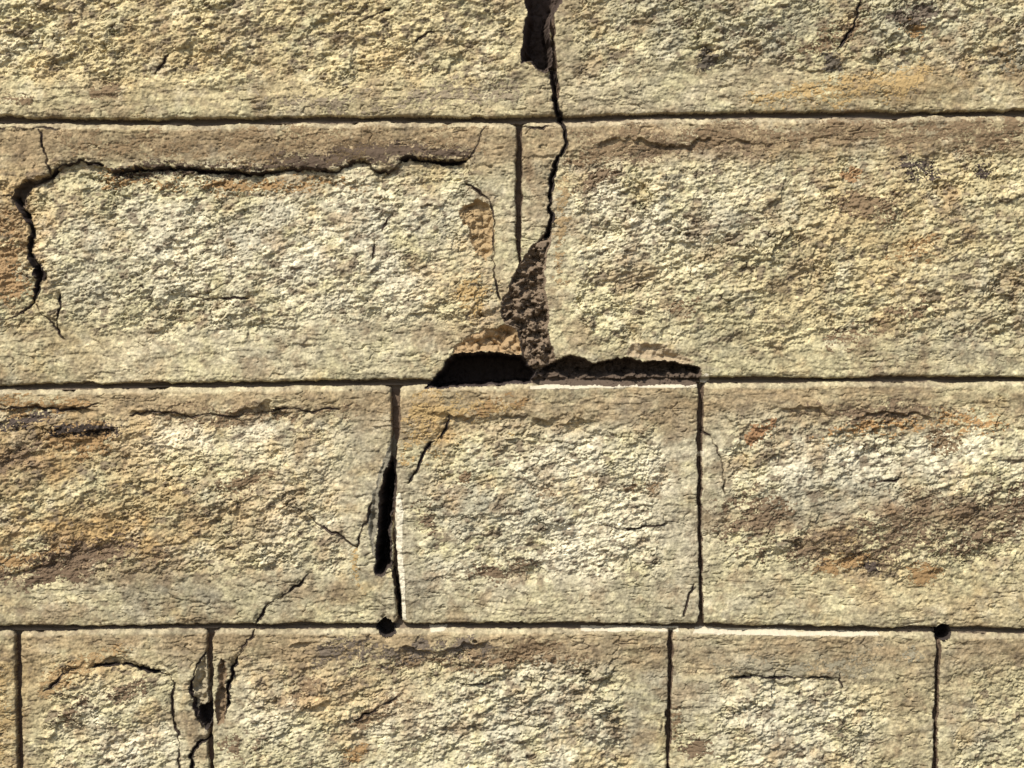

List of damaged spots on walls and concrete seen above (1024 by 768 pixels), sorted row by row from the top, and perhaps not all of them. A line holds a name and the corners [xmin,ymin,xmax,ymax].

crack [524,71,569,236]
crack [0,126,500,299]
crack [1,194,64,339]
crack [189,294,247,302]
peeling [424,230,702,389]
crack [132,407,339,418]
crack [409,416,450,482]
crack [310,505,371,547]
crack [392,568,402,617]
crack [44,574,308,768]
crack [355,694,401,721]